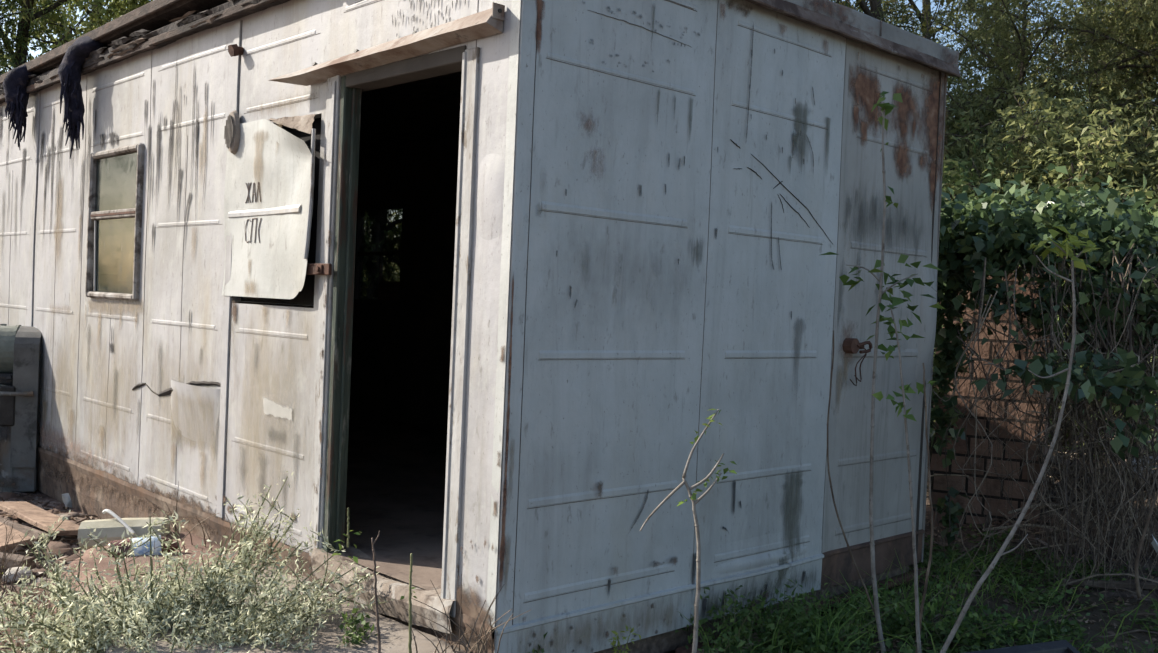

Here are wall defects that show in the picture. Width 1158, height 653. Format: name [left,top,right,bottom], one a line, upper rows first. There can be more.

corrosion [536,0,544,50]
water stain [0,99,118,237]
water stain [144,62,212,246]
water stain [790,106,807,167]
corrosion [850,53,956,205]